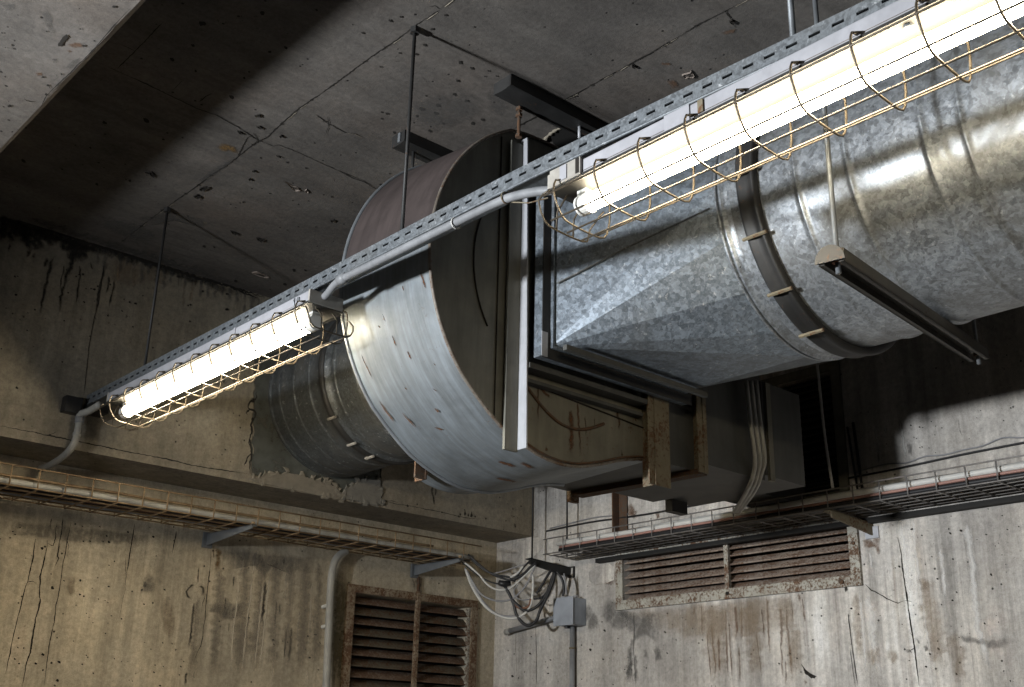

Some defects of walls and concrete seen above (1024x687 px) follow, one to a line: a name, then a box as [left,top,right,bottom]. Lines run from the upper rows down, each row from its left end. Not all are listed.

crack [18,0,453,389]
damp [0,216,115,307]
peeling [252,466,369,506]
damp [186,569,204,662]
damp [212,554,346,679]
crack [865,540,919,682]